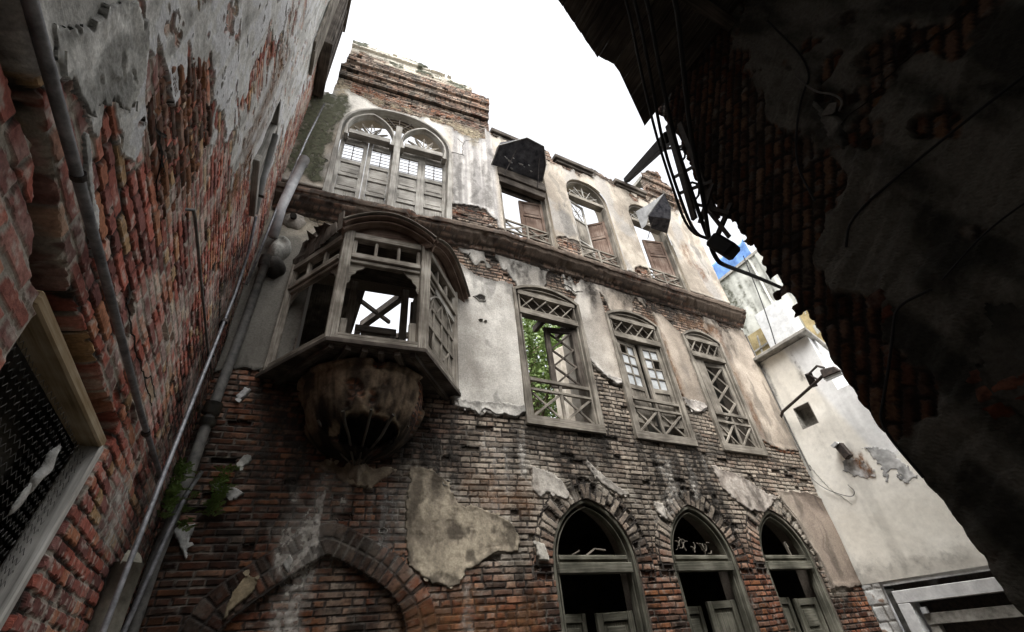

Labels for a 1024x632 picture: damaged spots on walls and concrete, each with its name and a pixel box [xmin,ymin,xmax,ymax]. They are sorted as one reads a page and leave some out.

flaking render [53,0,212,229]
damp [310,157,326,182]
flaking render [456,398,526,417]
flaking render [682,397,707,413]
flaking render [531,467,572,500]
flaking render [585,458,630,497]
flaking render [710,465,777,513]
peeling [843,446,917,483]
flaking render [174,524,195,559]
flaking render [315,458,520,589]
flaking render [533,541,550,561]
flaking render [222,570,260,620]